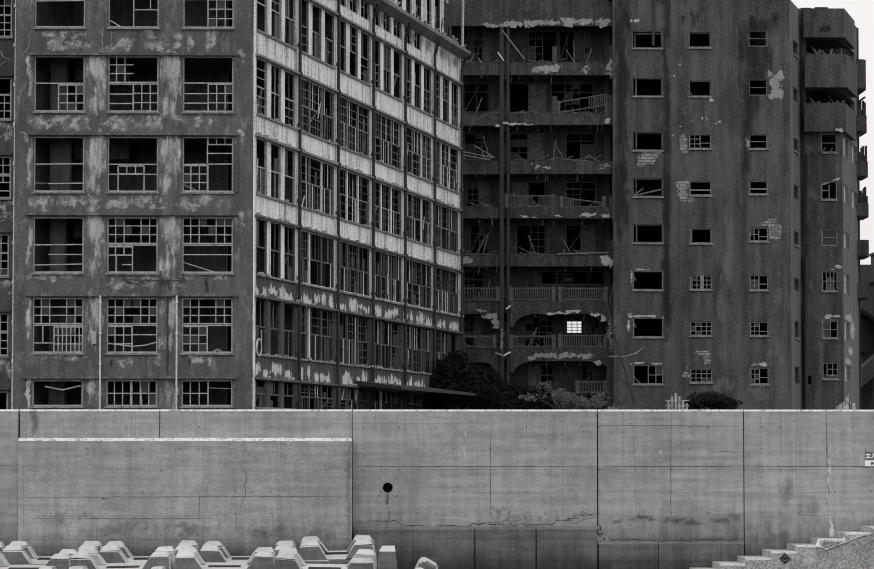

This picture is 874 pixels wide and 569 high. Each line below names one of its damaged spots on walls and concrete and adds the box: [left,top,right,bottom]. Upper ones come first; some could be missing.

spalling [483,17,612,28]
spalling [531,63,560,74]
peeling [768,70,785,101]
damp [615,0,629,231]
damp [661,164,671,322]
damp [717,183,747,325]
spalling [760,218,783,241]
spalling [255,212,464,394]
spalling [475,309,504,349]
spalling [527,352,602,366]
peeling [591,310,664,402]
crack [355,512,741,541]